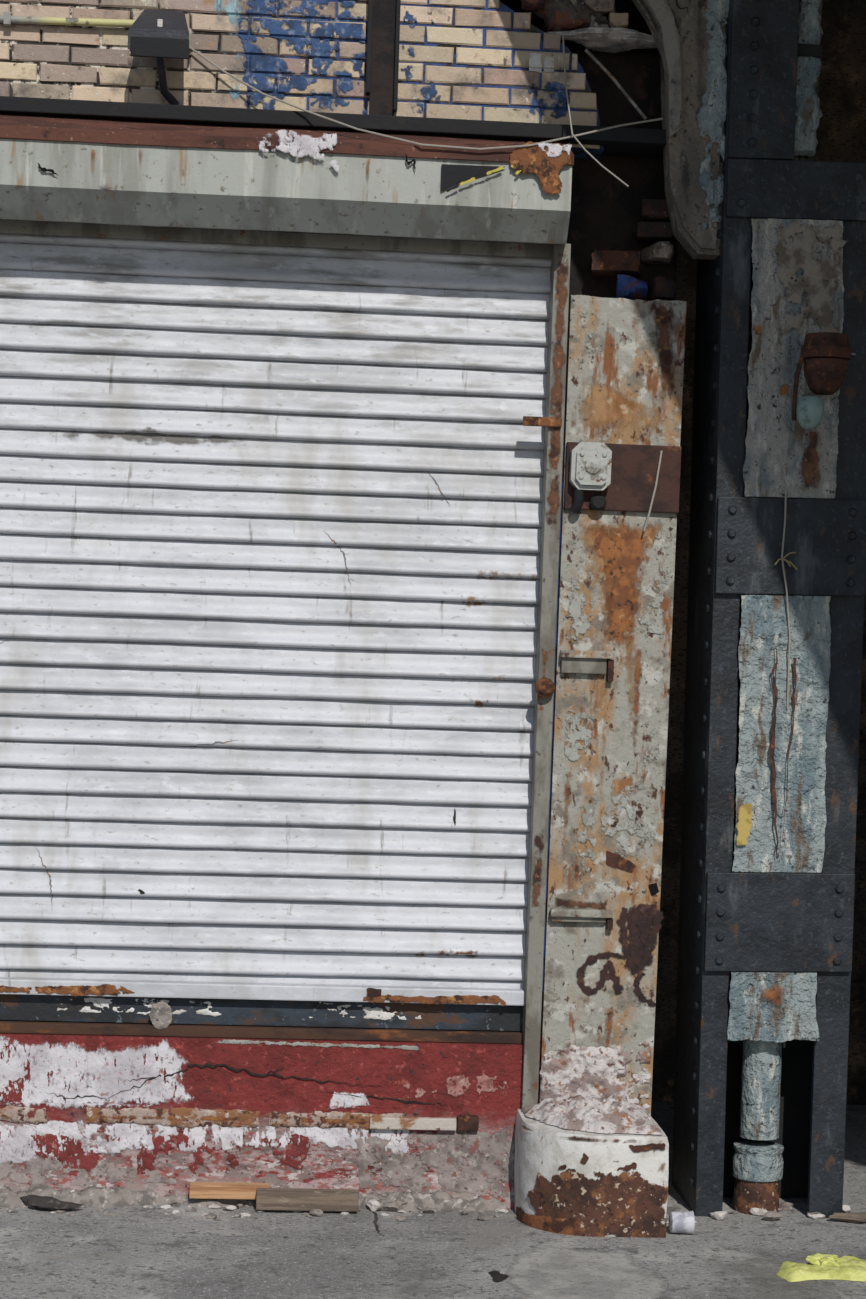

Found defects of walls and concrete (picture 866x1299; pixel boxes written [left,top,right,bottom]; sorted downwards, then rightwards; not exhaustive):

peeling [259,130,339,172]
peeling [237,0,366,110]
peeling [401,42,441,113]
corrosion [510,141,572,194]
peeling [528,81,571,119]
peeling [538,142,572,158]
peeling [696,0,729,230]
corrosion [546,254,682,726]
corrosion [0,984,135,996]
peeling [0,997,515,1198]
spalling [540,1041,652,1109]
corrosion [516,1168,668,1238]